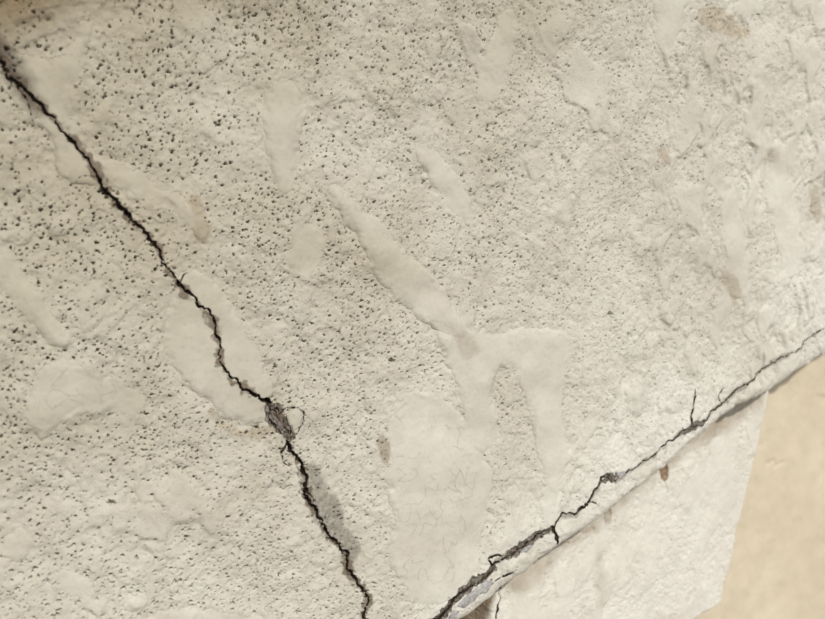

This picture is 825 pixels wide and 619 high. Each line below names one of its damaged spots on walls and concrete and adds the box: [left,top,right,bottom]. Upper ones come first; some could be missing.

crack [0,59,369,619]
crack [397,328,825,619]